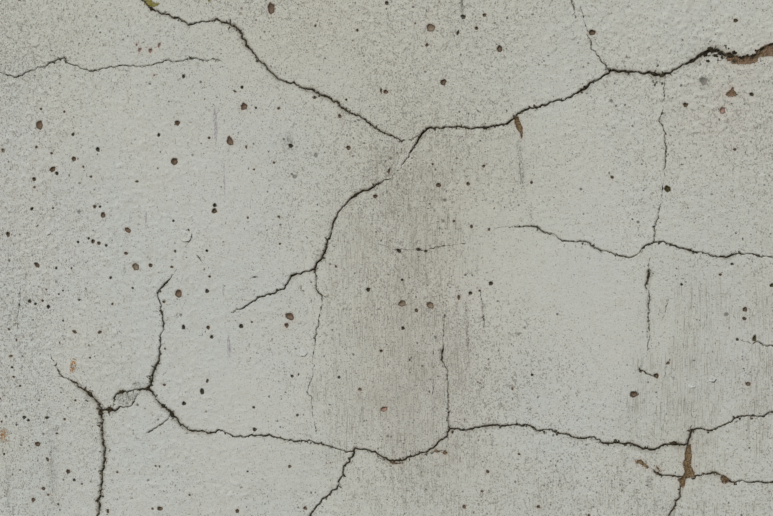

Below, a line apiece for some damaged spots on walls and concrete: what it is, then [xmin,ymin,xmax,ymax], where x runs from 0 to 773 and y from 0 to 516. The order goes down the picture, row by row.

crack [0,56,222,78]
crack [142,0,773,429]
crack [51,269,773,516]